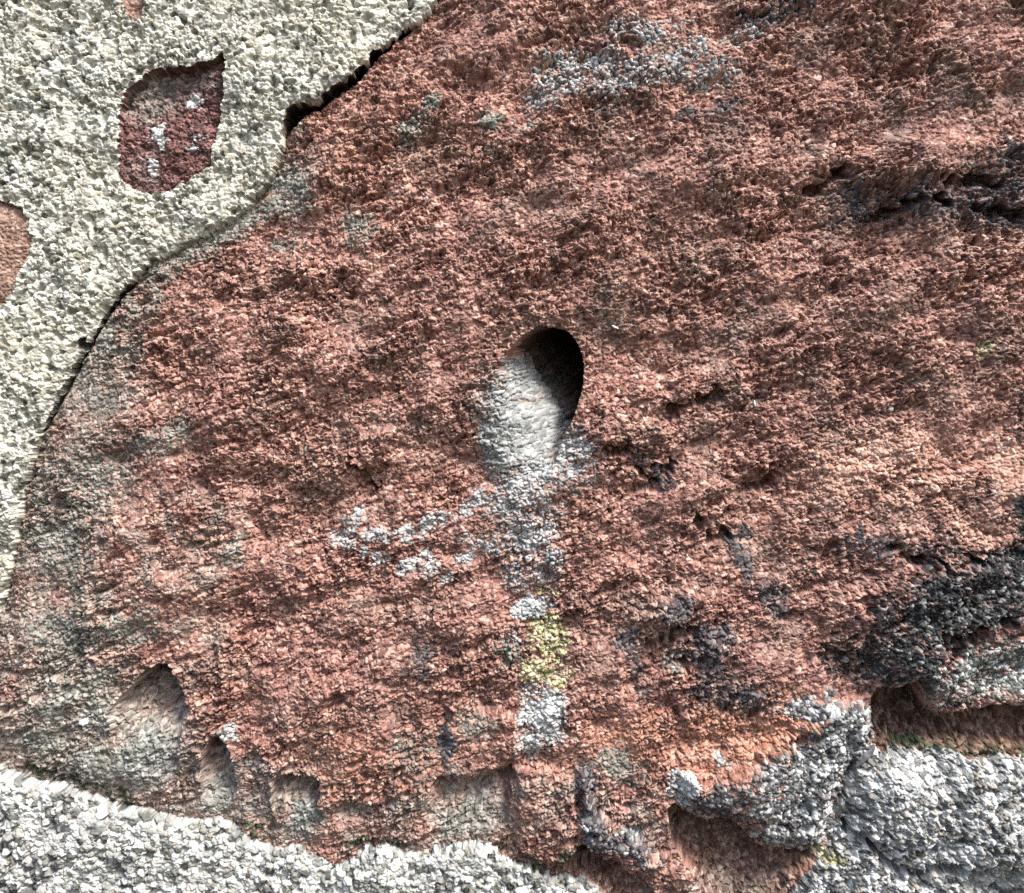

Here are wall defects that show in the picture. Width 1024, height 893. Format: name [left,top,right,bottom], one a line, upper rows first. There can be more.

crack [283,27,412,140]
spalling [517,328,584,432]
spalling [851,676,1024,769]
spalling [667,803,822,893]